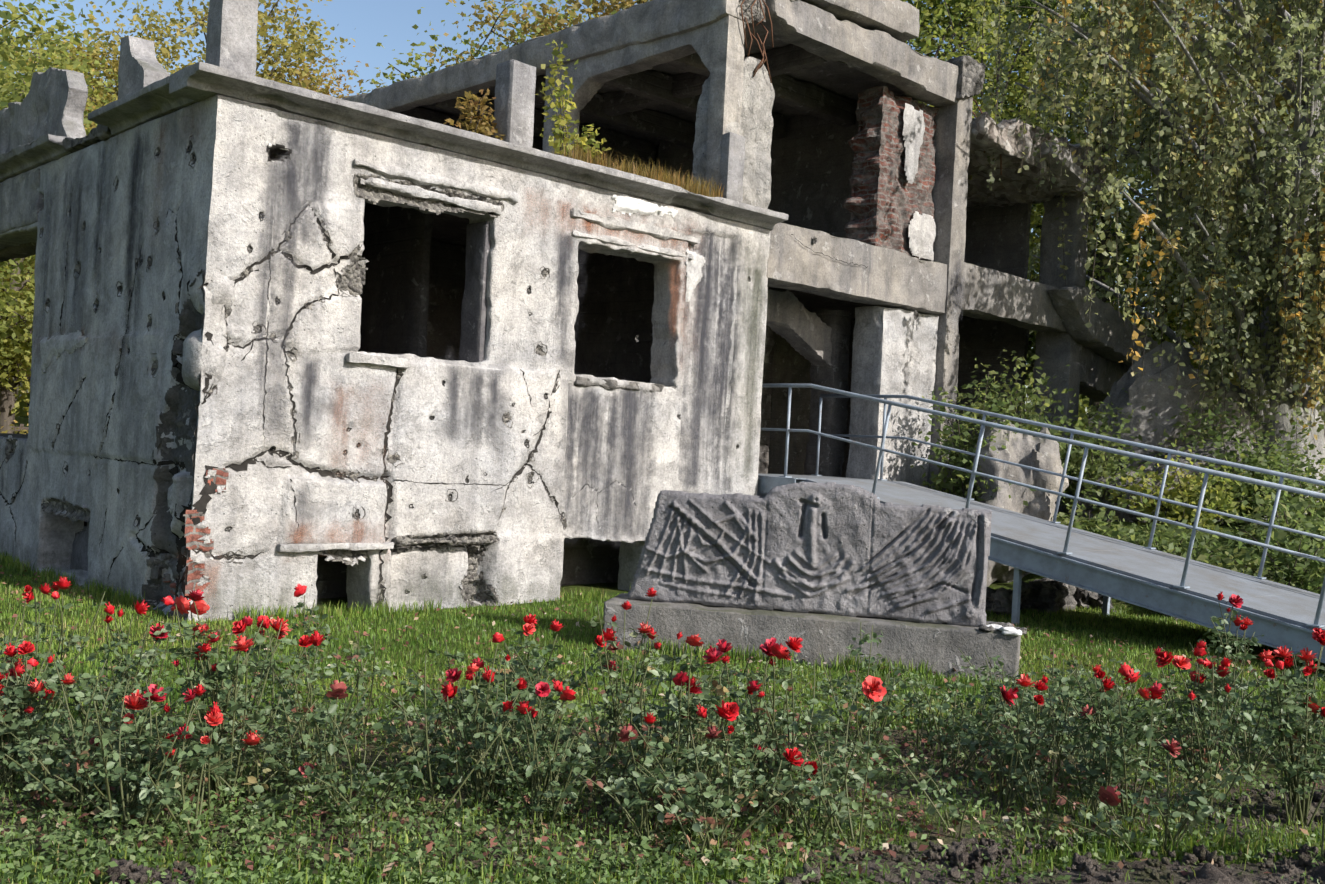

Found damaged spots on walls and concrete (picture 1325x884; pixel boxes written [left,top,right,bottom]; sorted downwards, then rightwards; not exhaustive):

peeling [903,103,925,184]
peeling [908,211,936,261]
water stain [681,233,739,485]
crack [0,204,636,620]
flaking render [205,468,229,493]
water stain [567,385,648,534]
flaking render [183,510,233,596]